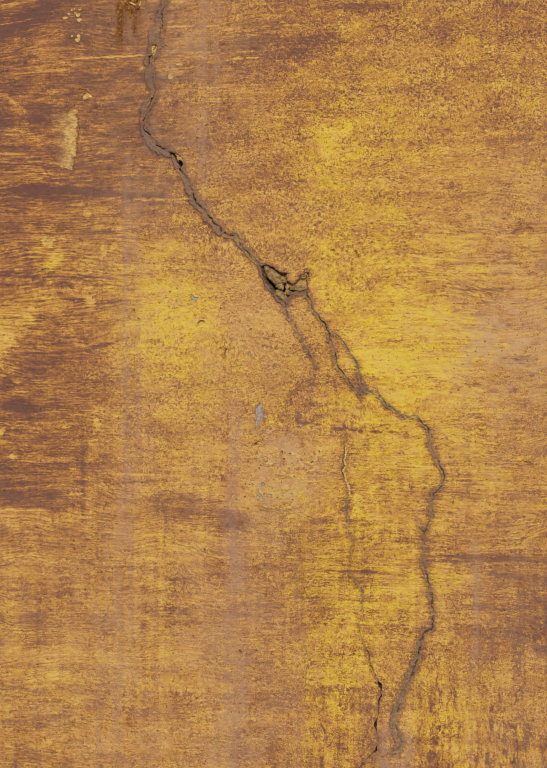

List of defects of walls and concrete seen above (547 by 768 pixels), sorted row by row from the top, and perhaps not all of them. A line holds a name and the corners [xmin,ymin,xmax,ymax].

flaking render [47,87,94,172]
crack [137,0,449,768]